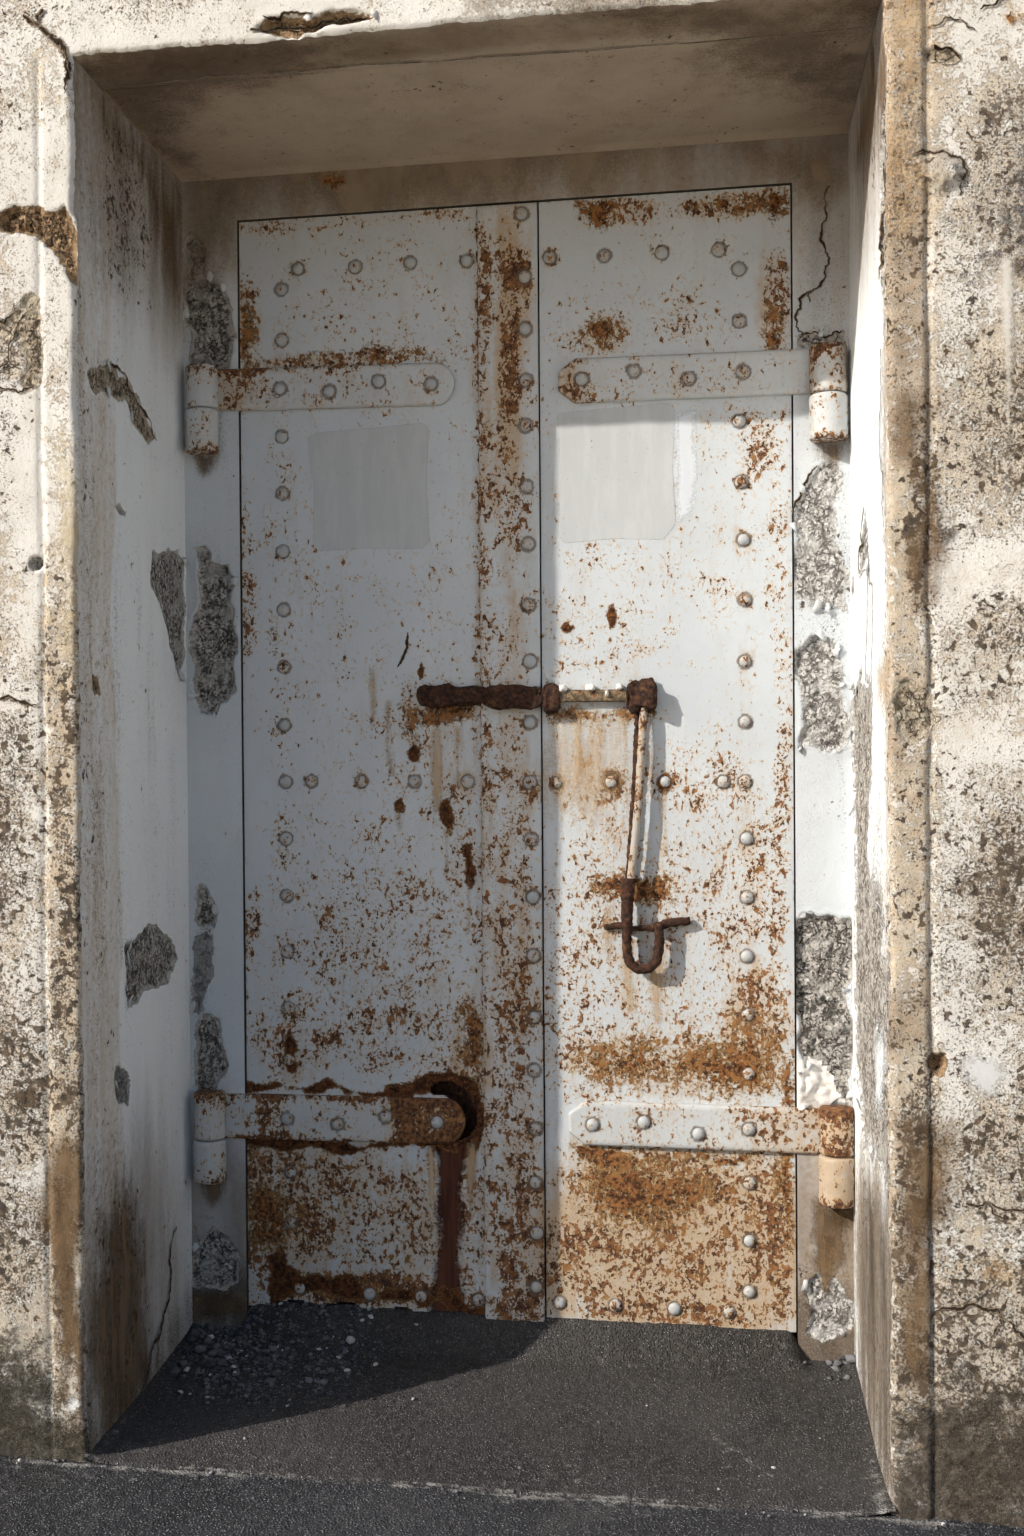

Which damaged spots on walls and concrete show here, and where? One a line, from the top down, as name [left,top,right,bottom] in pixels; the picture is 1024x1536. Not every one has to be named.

spalling [250,10,378,39]
spalling [0,205,81,287]
crack [794,185,843,343]
spalling [0,292,43,392]
spalling [150,546,239,718]
rust [438,798,477,890]
rust [589,869,679,909]
peeling [789,459,937,1207]
peeling [124,883,229,1093]
rust [563,1009,795,1107]
rust [247,996,485,1315]
rust [569,1143,854,1292]